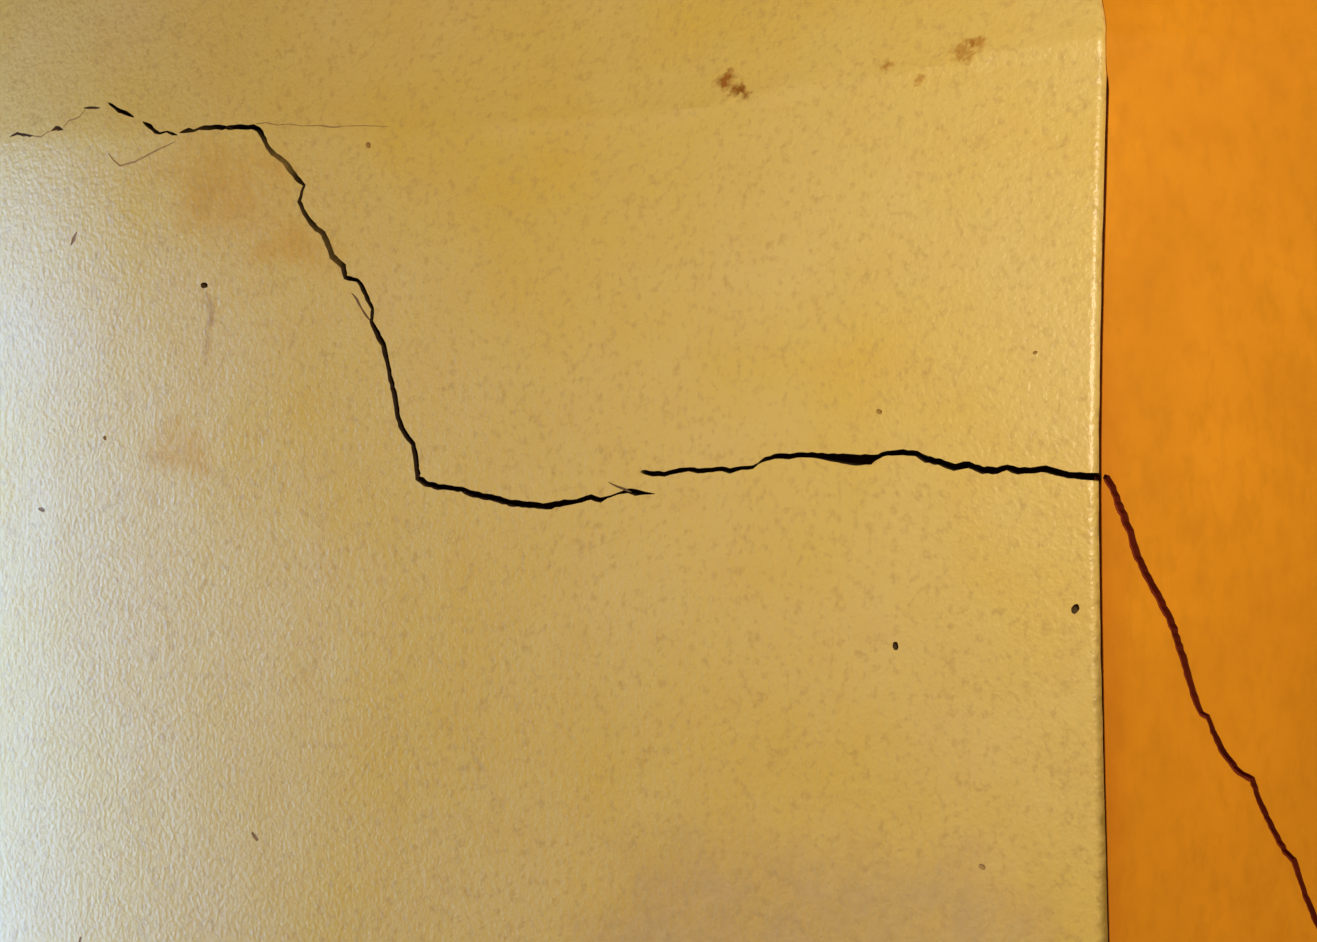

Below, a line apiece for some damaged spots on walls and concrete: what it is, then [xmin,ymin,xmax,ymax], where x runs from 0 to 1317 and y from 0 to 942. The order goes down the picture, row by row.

crack [11,103,655,509]
crack [641,80,1317,942]